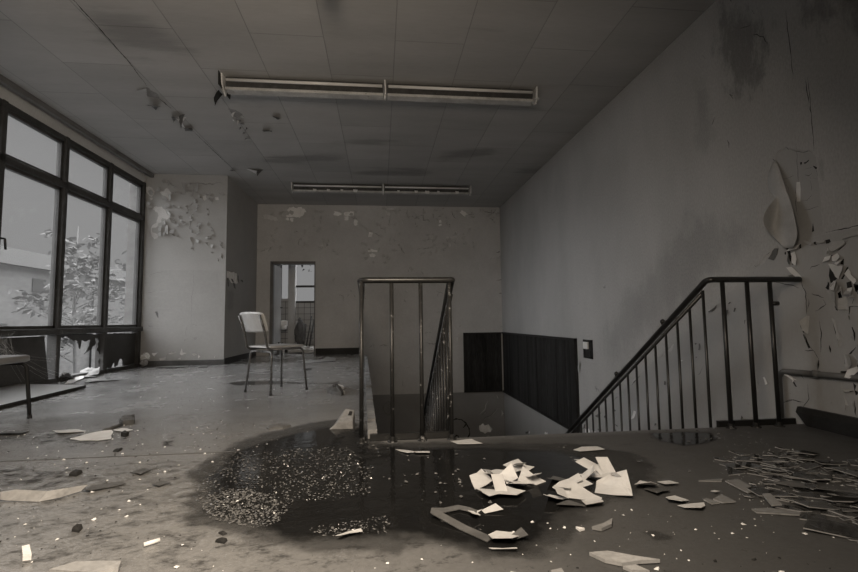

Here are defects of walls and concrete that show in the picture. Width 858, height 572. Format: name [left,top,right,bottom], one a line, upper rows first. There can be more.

peeling [145,179,224,261]
peeling [753,225,858,356]
peeling [842,344,858,395]
leakage [328,429,389,459]